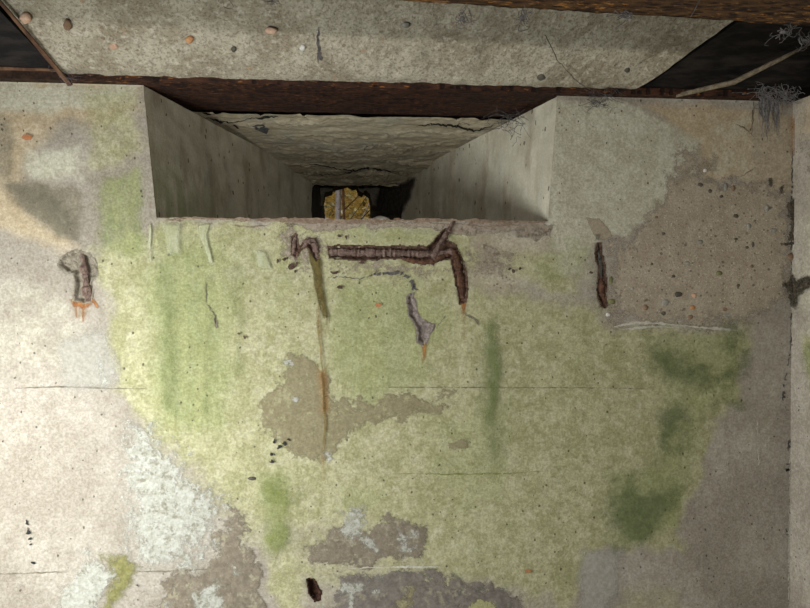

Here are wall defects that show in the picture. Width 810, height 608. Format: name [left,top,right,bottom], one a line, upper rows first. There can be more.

spalling [586,150,810,333]
crack [787,149,795,273]
rust [71,300,98,321]
crack [782,293,792,407]